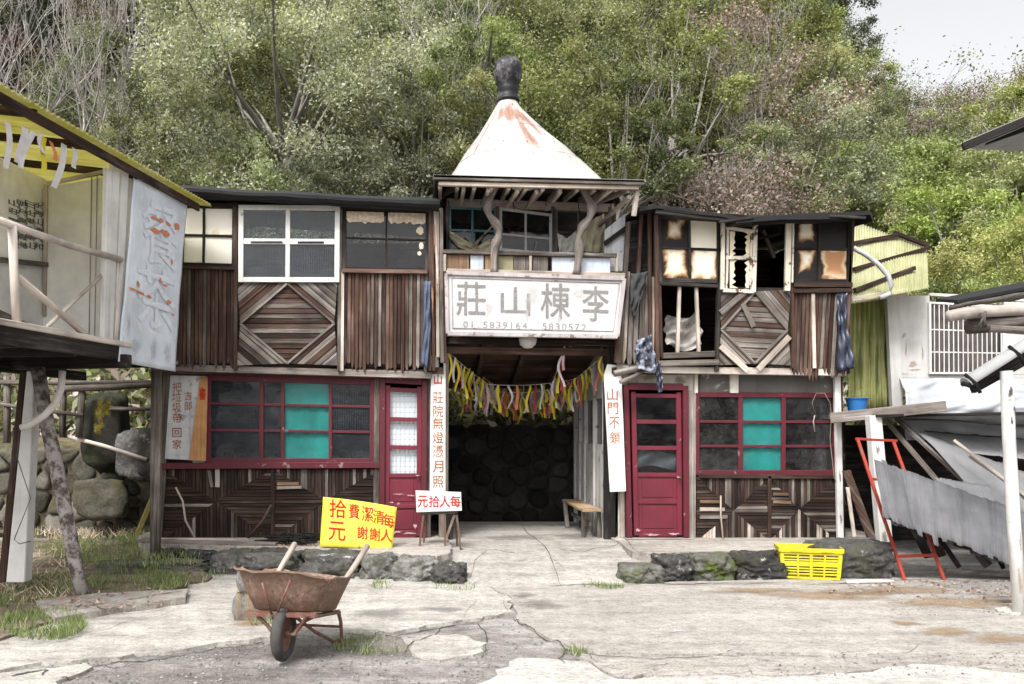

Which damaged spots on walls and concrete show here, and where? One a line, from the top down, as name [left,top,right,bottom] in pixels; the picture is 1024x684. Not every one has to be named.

corrosion [470,103,555,150]
crack [328,526,795,678]